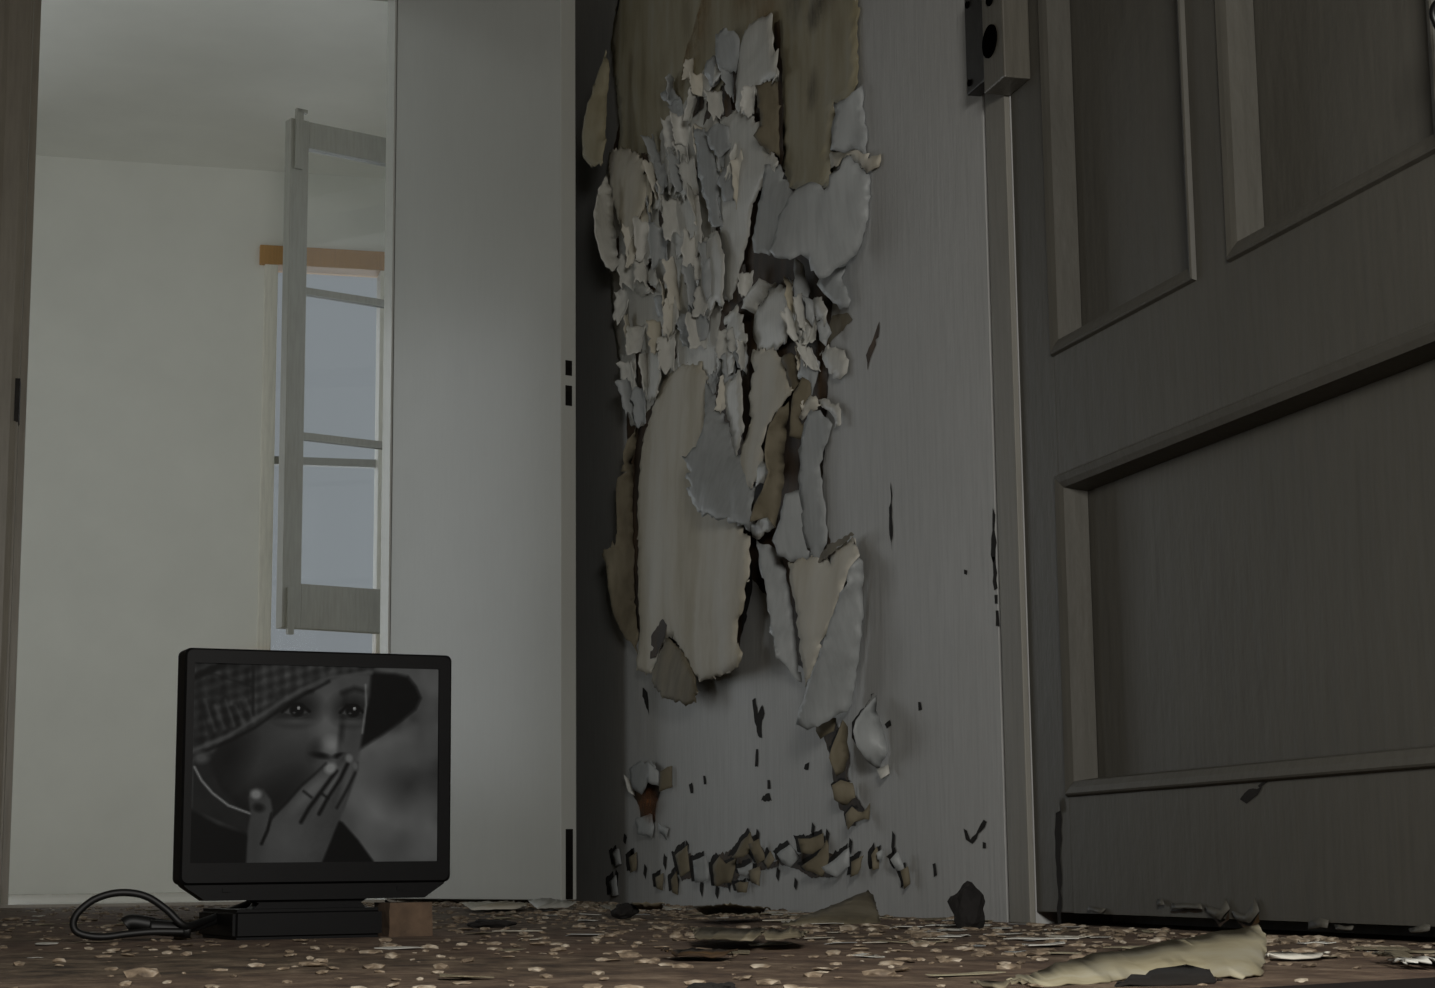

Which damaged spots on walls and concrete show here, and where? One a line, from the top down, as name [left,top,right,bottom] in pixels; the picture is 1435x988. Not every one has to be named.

peeling [582,0,910,899]